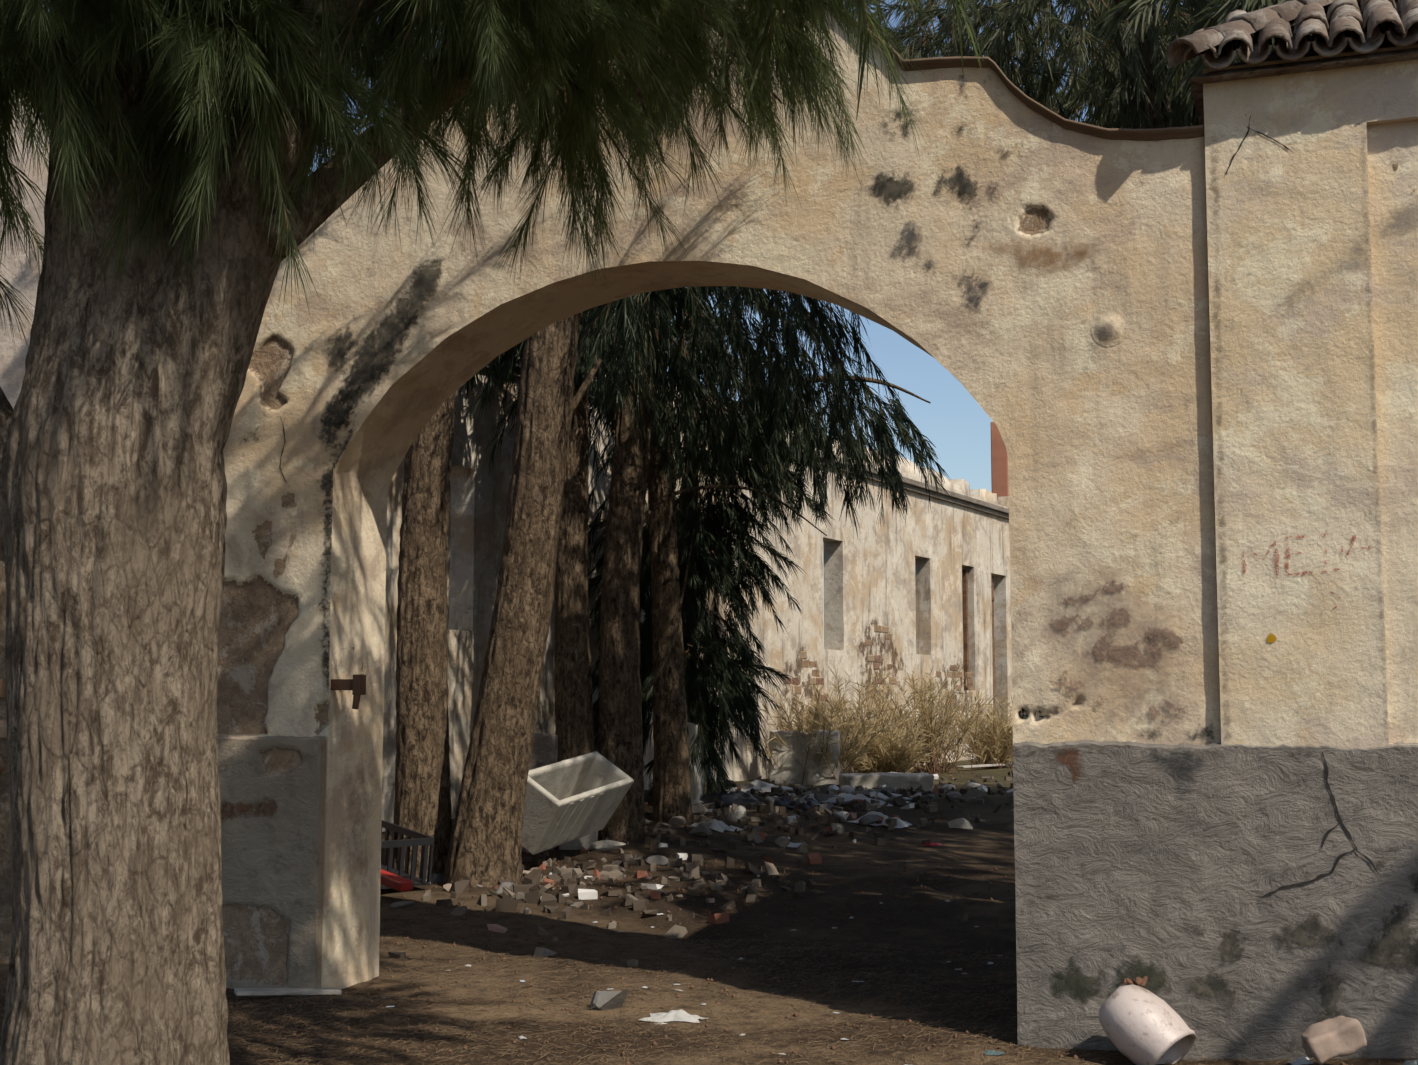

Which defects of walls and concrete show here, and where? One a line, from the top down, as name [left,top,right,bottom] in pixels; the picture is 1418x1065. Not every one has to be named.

crack [1226,116,1294,174]
damp [868,172,916,208]
damp [933,165,996,242]
damp [892,222,933,269]
damp [958,274,989,311]
spalling [249,335,293,410]
damp [319,259,442,686]
spalling [217,574,300,734]
flaking render [0,556,12,961]
crack [1260,752,1379,898]
damp [1271,873,1418,972]
damp [1052,954,1170,1004]